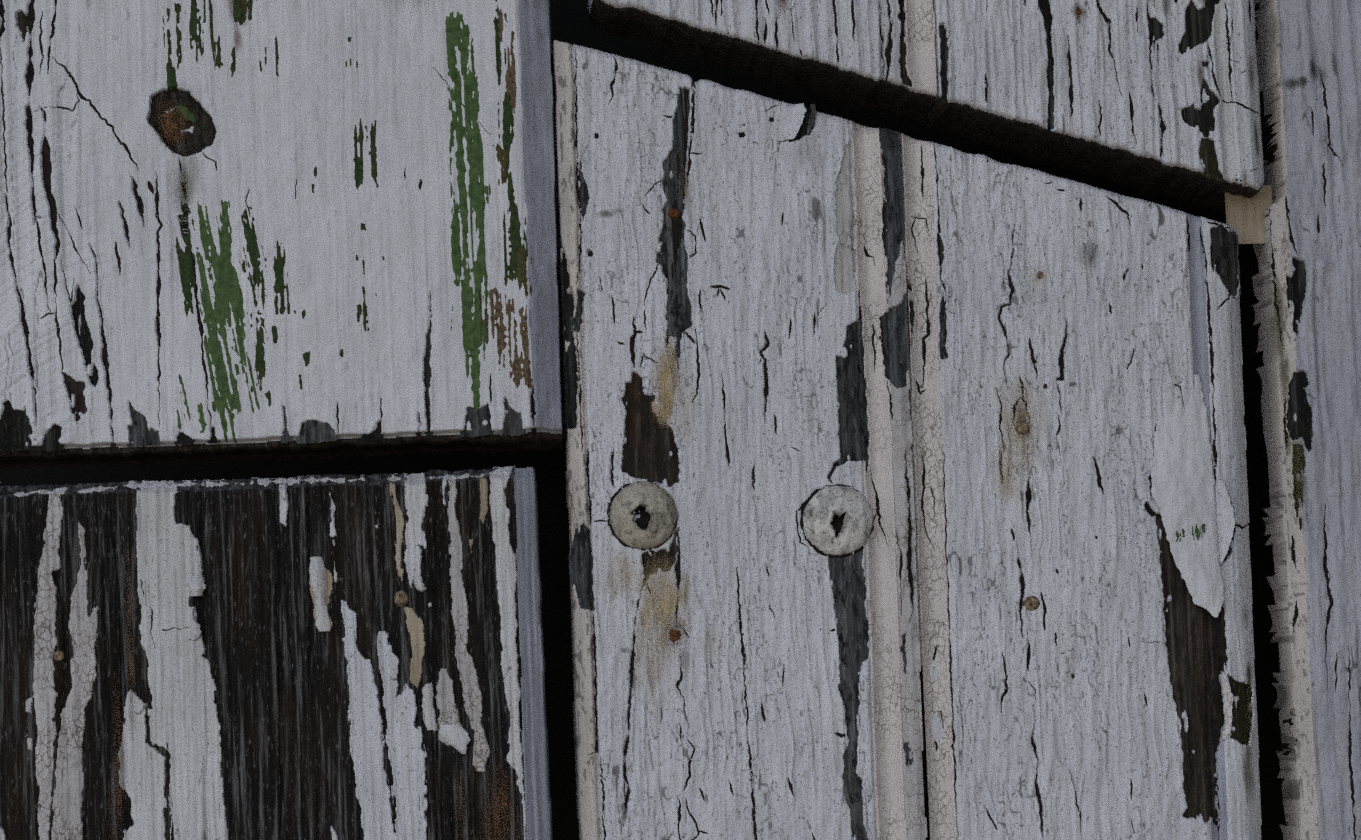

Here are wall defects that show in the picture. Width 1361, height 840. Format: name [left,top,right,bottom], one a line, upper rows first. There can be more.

peeling [25,494,99,840]
crack [0,0,217,449]
peeling [118,486,229,840]
peeling [148,0,236,157]
peeling [127,182,338,448]
peeling [309,472,490,840]
peeling [445,0,534,437]
peeling [478,467,527,840]
peeling [621,372,680,487]
peeling [828,550,869,840]
peeling [1151,374,1253,825]
peeling [1181,62,1225,183]